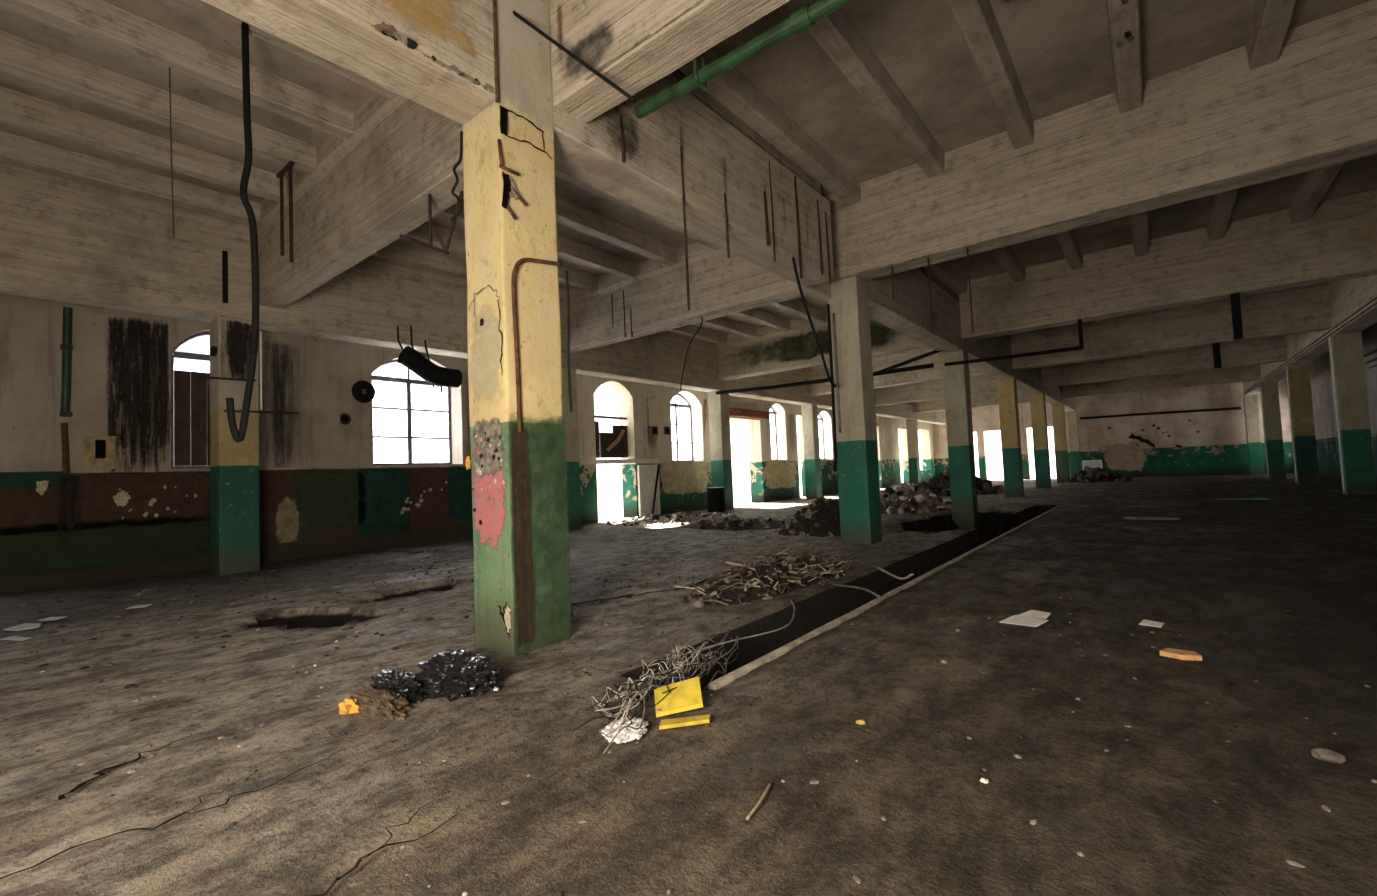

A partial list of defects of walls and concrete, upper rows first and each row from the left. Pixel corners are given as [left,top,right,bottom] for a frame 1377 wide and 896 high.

spalling [502,171,520,209]
damp [107,318,170,473]
flaking render [0,471,211,535]
crack [58,735,192,801]
crack [0,746,352,879]
crack [307,800,458,896]